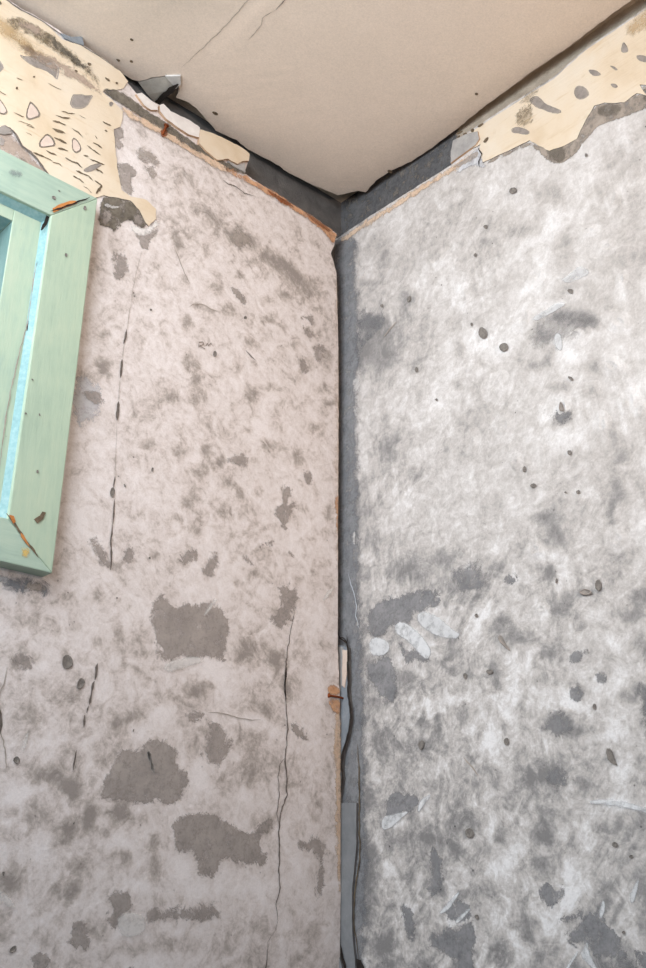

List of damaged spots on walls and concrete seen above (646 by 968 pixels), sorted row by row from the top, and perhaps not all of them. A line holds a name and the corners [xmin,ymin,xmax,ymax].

damp [9,17,95,79]
crack [182,0,285,67]
peeling [0,0,163,250]
peeling [341,9,646,241]
peeling [101,75,369,961]
peeling [367,588,441,637]
crack [0,669,8,772]
spalling [62,655,73,669]
peeling [366,656,397,703]
peeling [399,642,429,663]
peeling [569,685,584,702]
crack [265,610,295,968]